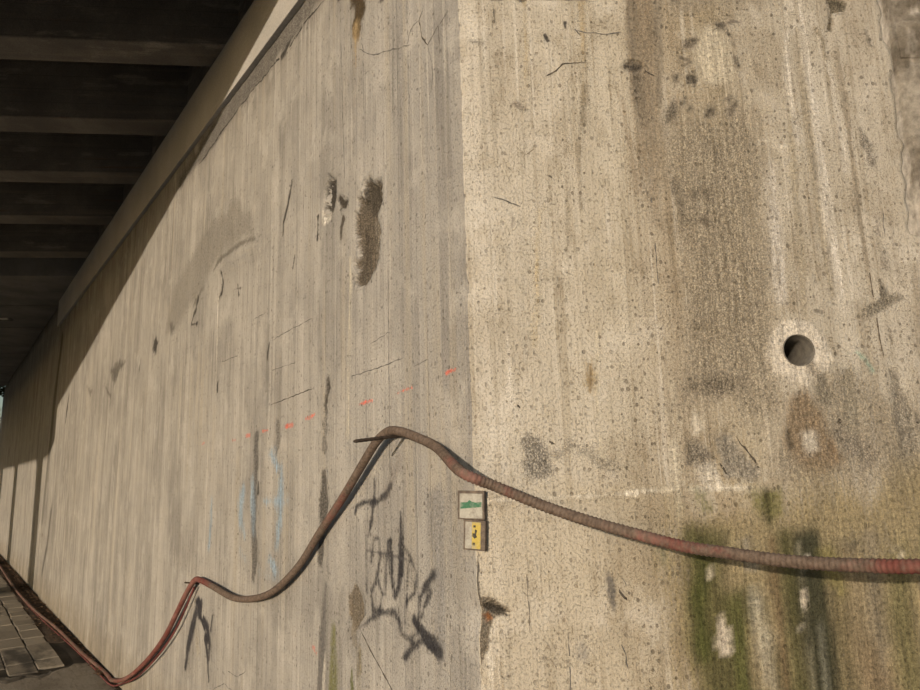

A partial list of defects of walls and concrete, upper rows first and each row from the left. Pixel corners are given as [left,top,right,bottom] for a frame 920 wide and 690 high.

corrosion [347,0,385,120]
crack [341,6,447,88]
spalling [316,171,385,292]
damp [486,0,920,690]
spalling [476,552,517,690]